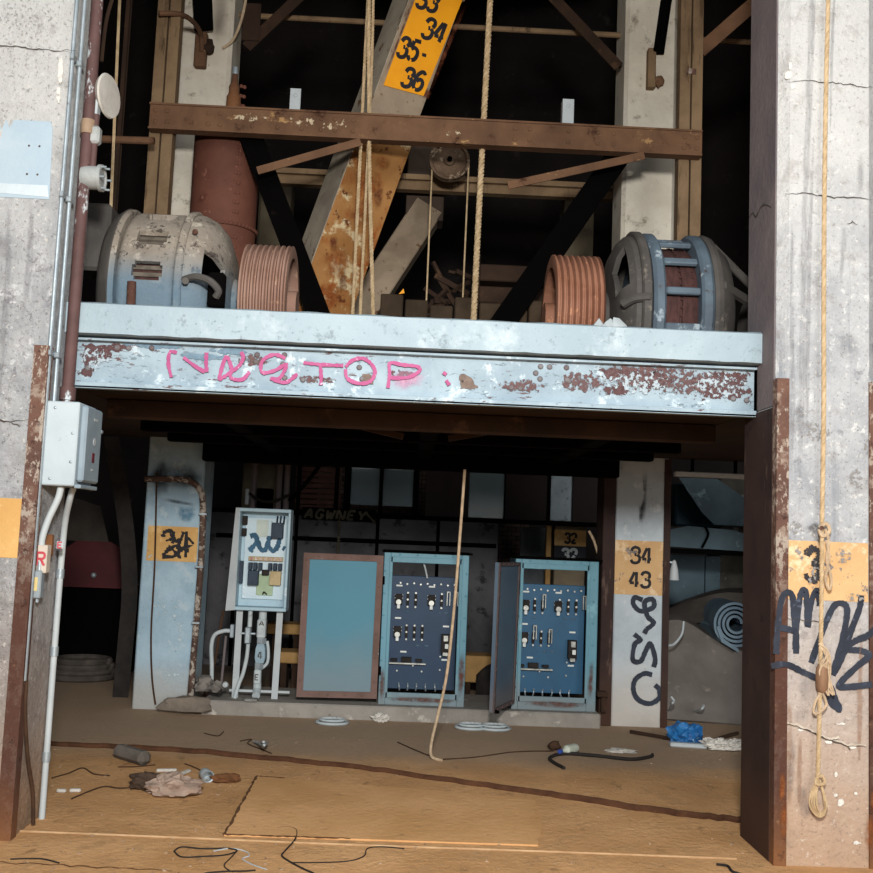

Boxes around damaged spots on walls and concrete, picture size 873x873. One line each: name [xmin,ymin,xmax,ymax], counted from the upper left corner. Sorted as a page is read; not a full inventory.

crack [0,44,76,52]
crack [793,80,871,88]
crack [749,192,871,217]
peeling [78,343,267,377]
peeling [494,365,754,404]
crack [787,722,866,751]